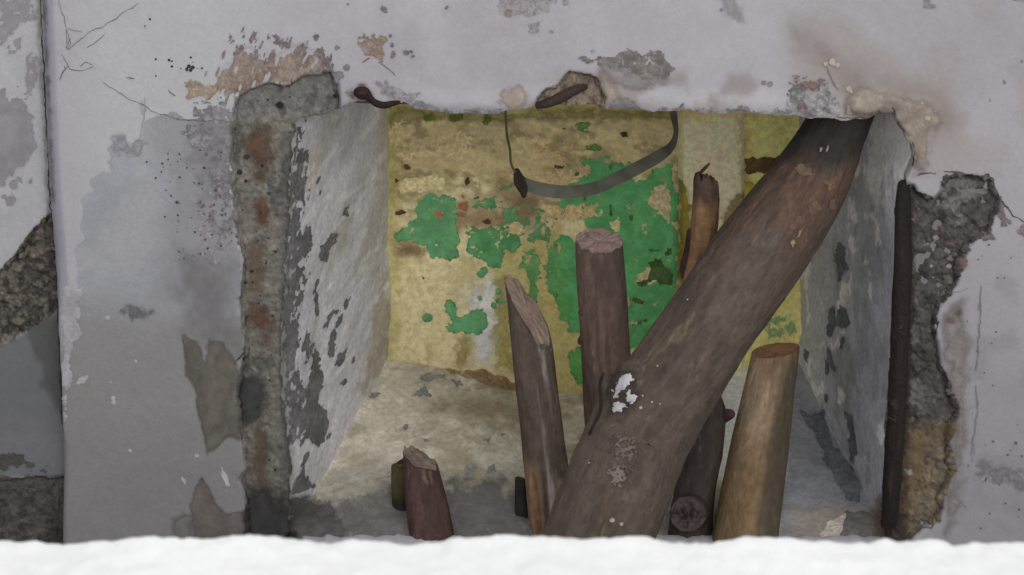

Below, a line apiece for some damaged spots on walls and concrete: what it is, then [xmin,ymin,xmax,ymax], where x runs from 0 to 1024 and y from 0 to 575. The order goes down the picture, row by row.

crack [55,286,63,423]
crack [40,0,226,212]
peeling [0,34,355,545]
flaking render [358,33,415,63]
peeling [375,48,679,350]
peeling [567,346,582,386]
rust [875,180,915,536]
spalling [799,171,1024,542]